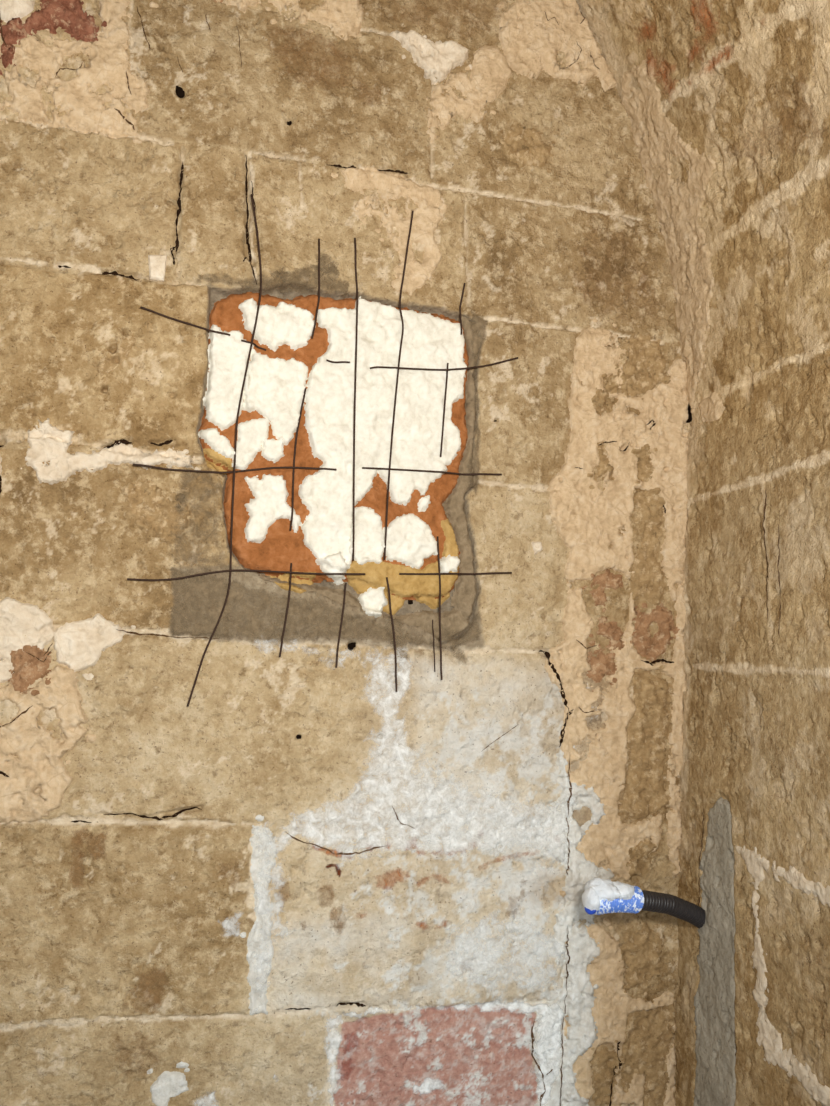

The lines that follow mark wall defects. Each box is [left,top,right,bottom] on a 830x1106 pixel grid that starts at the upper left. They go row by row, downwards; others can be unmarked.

peeling [0,0,151,144]
crack [170,163,184,265]
crack [243,157,258,285]
peeling [21,418,201,550]
peeling [496,0,716,1106]
peeling [0,597,136,825]
leakage [172,535,576,980]
crack [539,650,594,875]
leakage [326,1008,382,1101]
leakage [413,1078,444,1094]
leakage [439,918,563,1104]
crack [531,927,570,1106]